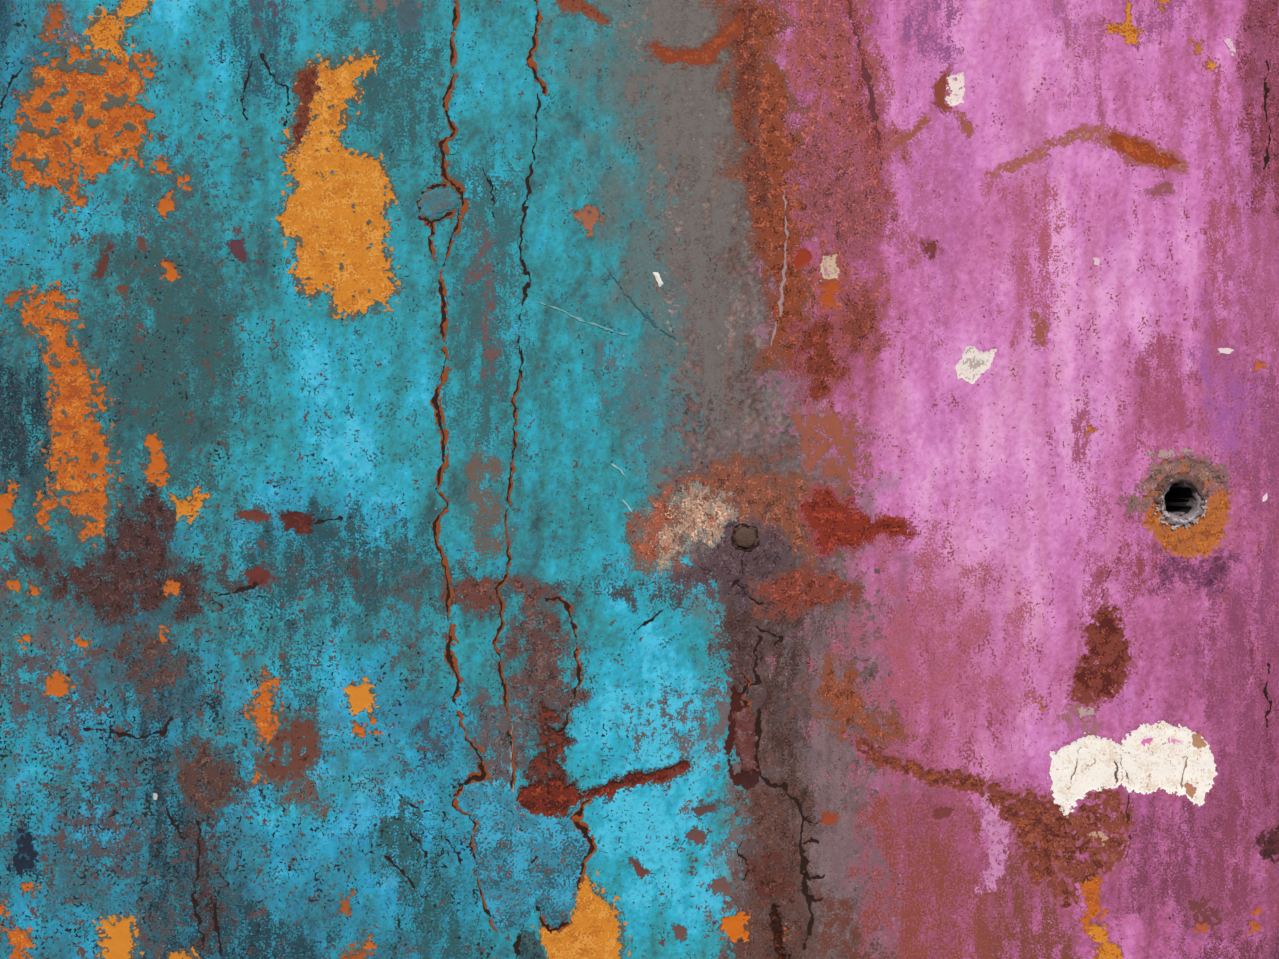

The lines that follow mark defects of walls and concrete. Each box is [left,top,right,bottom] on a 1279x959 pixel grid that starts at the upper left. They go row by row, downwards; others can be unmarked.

peeling [3,0,253,288]
peeling [269,46,407,325]
crack [13,515,313,959]
corrosion [0,0,492,959]
crack [308,0,572,959]
corrosion [369,157,644,792]
crack [570,798,597,891]
spalling [516,668,802,959]
crack [731,551,825,950]
corrosion [595,0,1091,959]
corrosion [1051,599,1138,737]
spalling [974,706,1218,959]